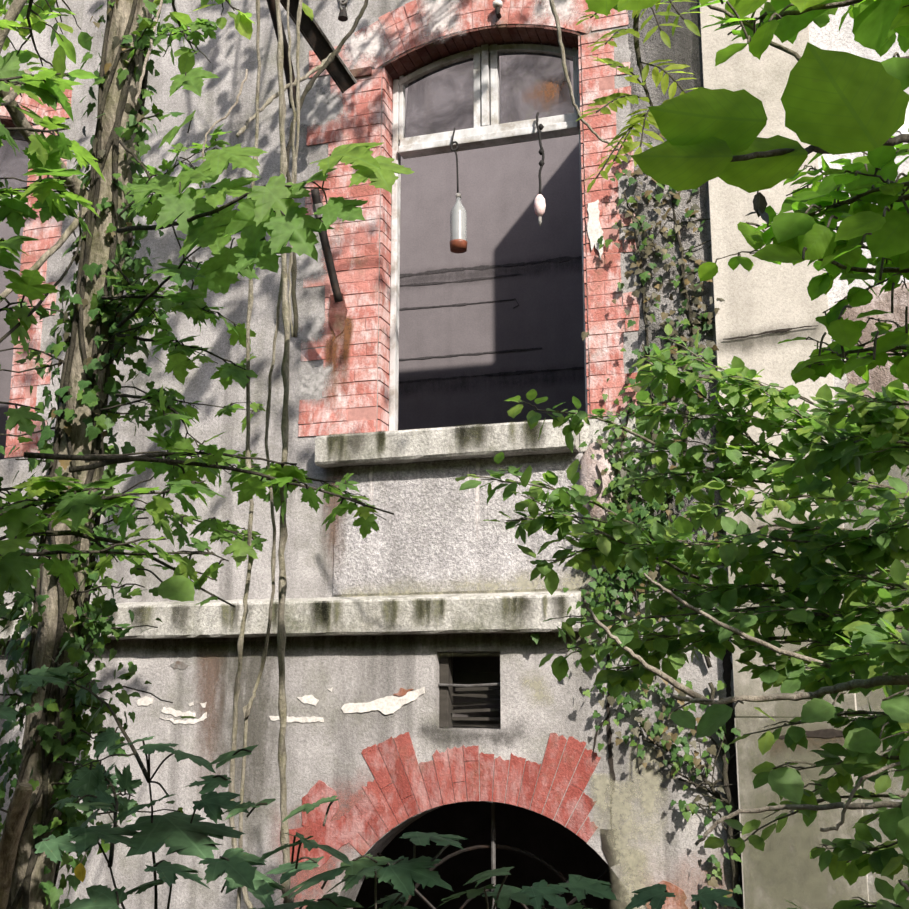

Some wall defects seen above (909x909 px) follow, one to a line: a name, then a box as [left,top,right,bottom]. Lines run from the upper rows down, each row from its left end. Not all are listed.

flaking render [587,200,605,260]
corrosion [326,293,352,391]
leakage [328,433,363,452]
leakage [377,431,385,451]
leakage [222,604,239,626]
leakage [312,590,444,624]
leakage [457,573,587,617]
leakage [314,636,356,649]
leakage [520,632,547,649]
peeling [269,695,324,723]
peeling [341,687,425,715]